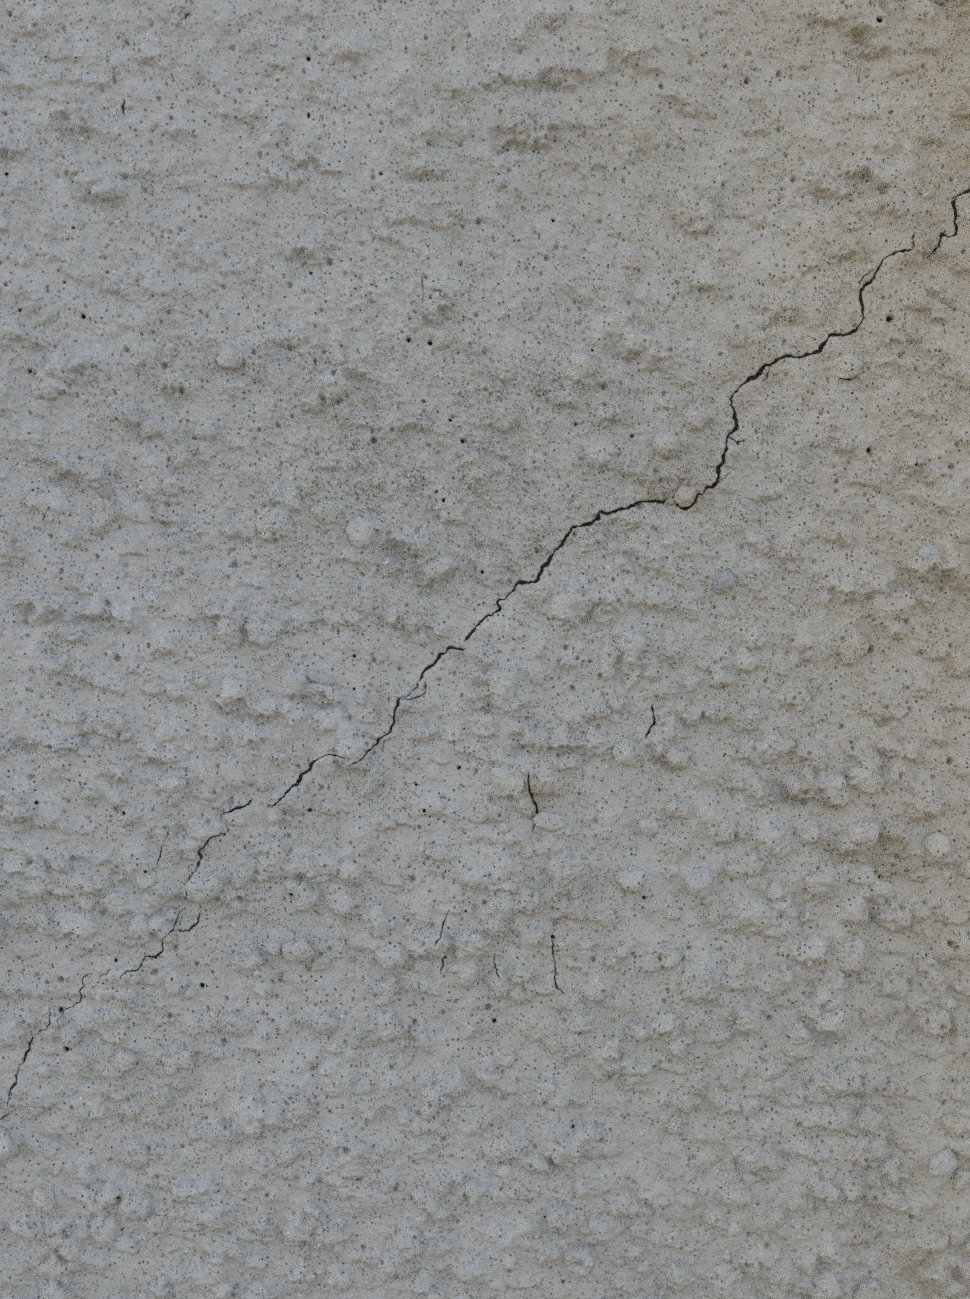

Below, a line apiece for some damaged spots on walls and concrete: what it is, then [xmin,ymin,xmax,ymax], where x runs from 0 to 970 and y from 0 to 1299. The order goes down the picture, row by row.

crack [0,188,970,1120]